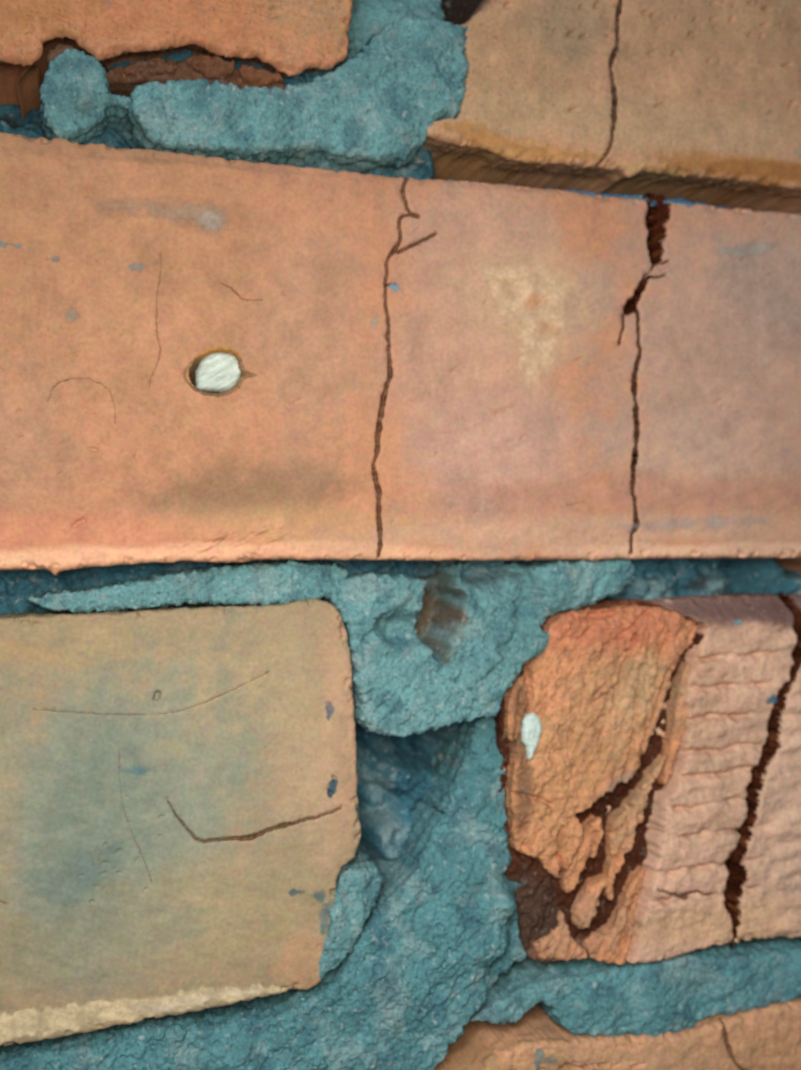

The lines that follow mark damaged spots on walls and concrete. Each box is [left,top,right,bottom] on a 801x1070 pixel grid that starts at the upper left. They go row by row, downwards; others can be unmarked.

spalling [47,43,75,67]
spalling [106,54,285,97]
crack [595,0,622,168]
crack [372,177,437,557]
crack [618,192,671,554]
crack [167,799,342,843]
spalling [492,598,705,965]
crack [658,591,801,949]